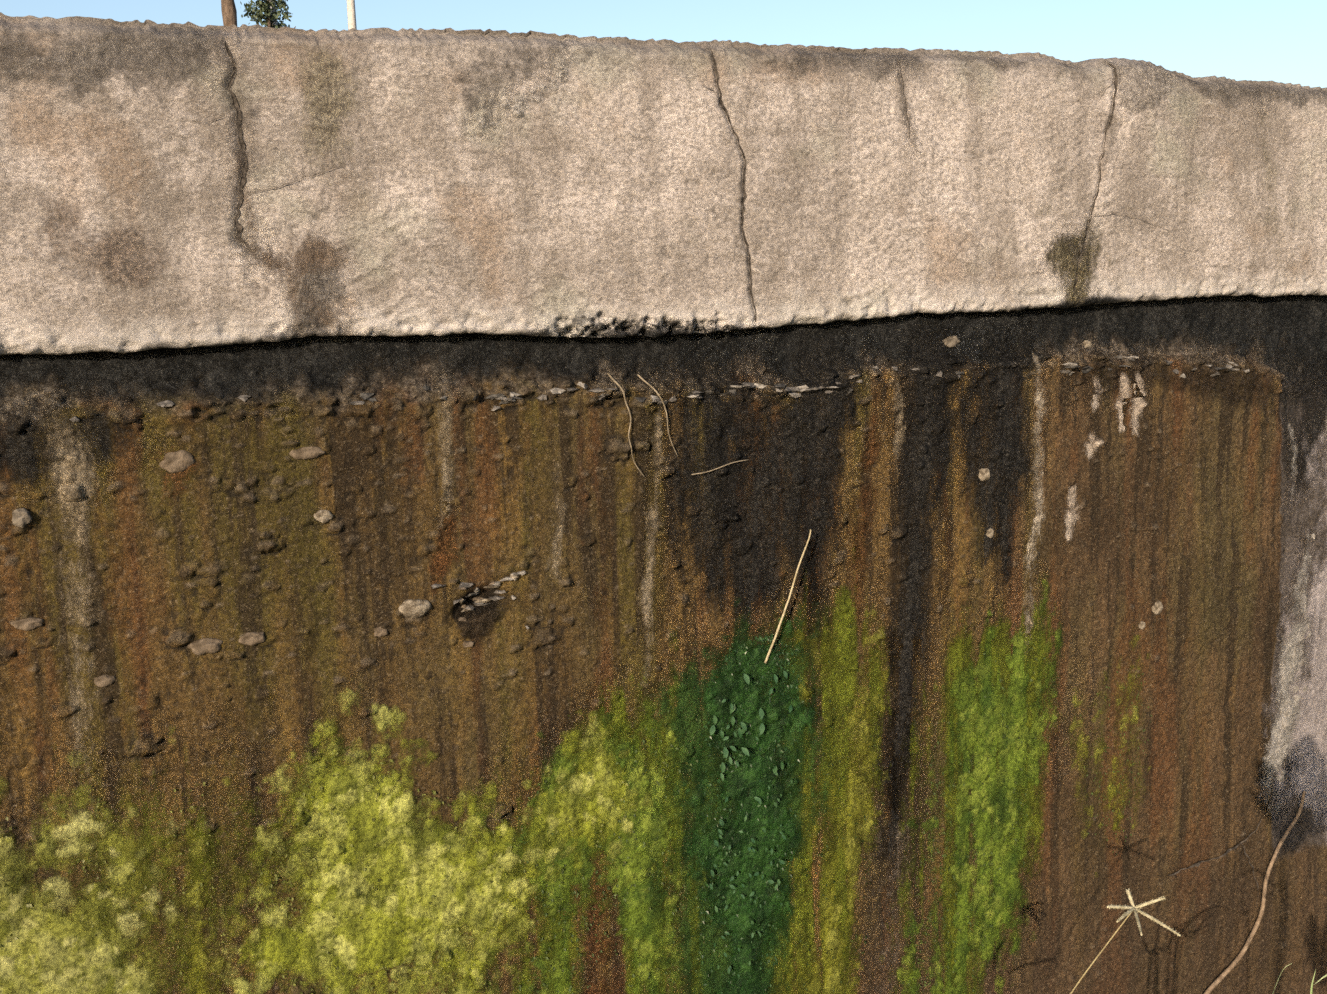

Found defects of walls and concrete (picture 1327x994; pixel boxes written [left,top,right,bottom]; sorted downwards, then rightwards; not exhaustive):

crack [195,39,352,251]
crack [704,48,756,322]
crack [894,56,912,143]
crack [1073,63,1169,298]
leakage [0,227,1327,918]